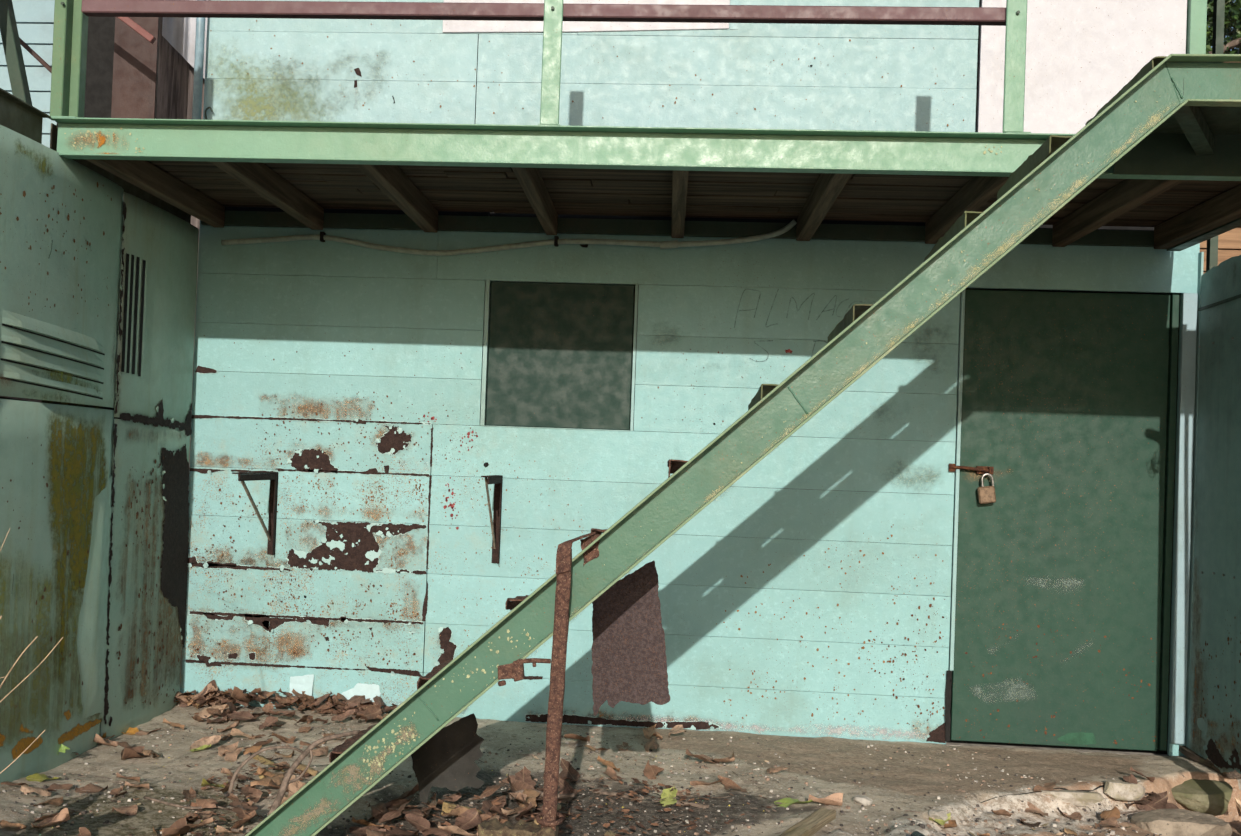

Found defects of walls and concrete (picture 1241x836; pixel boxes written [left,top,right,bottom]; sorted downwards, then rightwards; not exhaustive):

corrosion [75,132,114,154]
corrosion [525,560,747,731]
corrosion [716,514,1010,744]